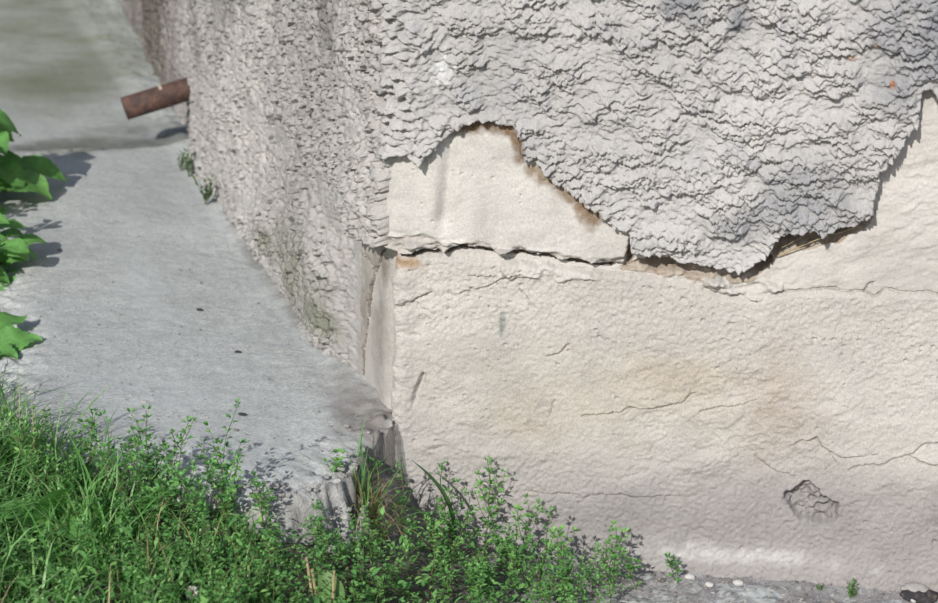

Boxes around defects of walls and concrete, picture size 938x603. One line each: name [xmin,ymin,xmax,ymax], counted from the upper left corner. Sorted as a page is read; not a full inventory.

flaking render [384,121,703,285]
flaking render [755,90,938,295]
crack [782,281,938,298]
crack [360,249,387,376]
peeling [394,299,429,338]
spalling [410,371,427,407]
crack [581,392,756,418]
crack [755,455,795,477]
crack [789,437,938,471]
crack [529,490,697,499]
hole [781,480,840,528]